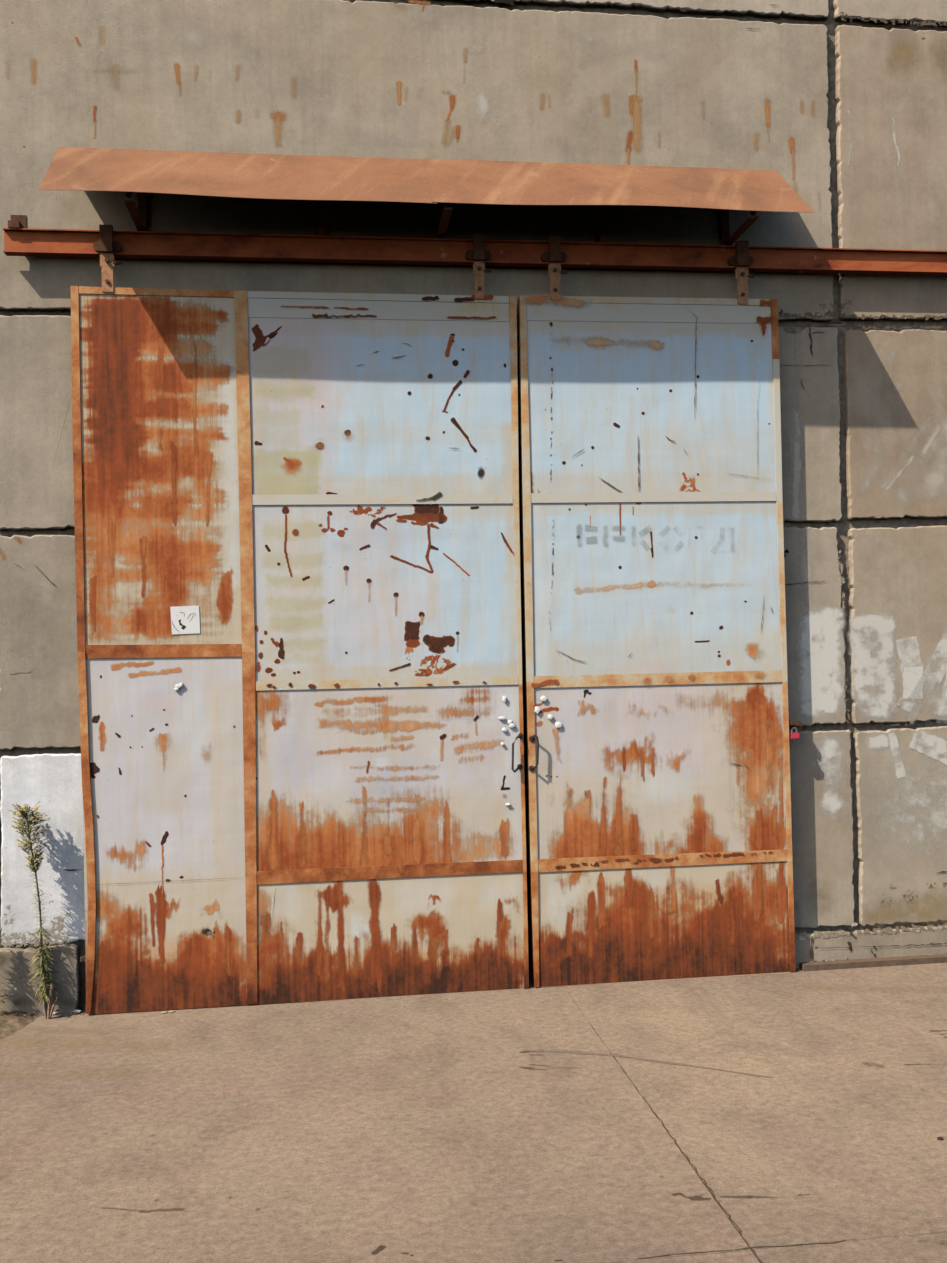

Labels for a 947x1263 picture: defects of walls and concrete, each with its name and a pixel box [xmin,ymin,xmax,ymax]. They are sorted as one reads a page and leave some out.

corrosion [443,95,460,143]
corrosion [626,60,642,165]
corrosion [80,295,233,641]
corrosion [265,506,310,581]
corrosion [390,524,470,576]
corrosion [100,661,182,678]
corrosion [531,679,559,688]
corrosion [748,644,758,658]
corrosion [534,702,559,754]
corrosion [85,689,524,1015]
corrosion [539,673,790,987]
crack [644,1096,854,1263]